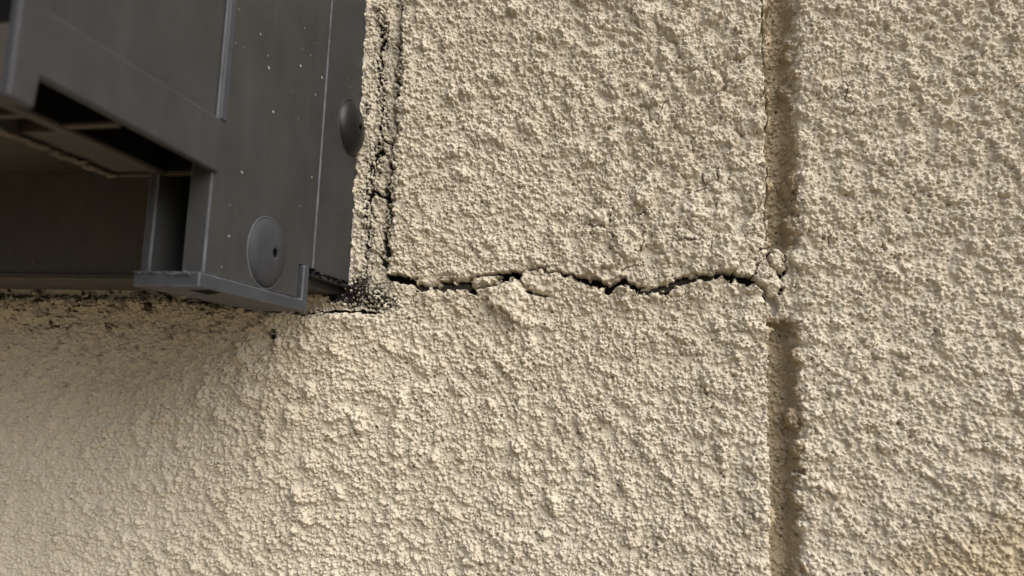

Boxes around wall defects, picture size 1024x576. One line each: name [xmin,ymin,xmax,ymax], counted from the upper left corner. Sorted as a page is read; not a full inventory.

damp [0,289,252,339]
damp [261,5,401,341]
crack [365,19,797,304]